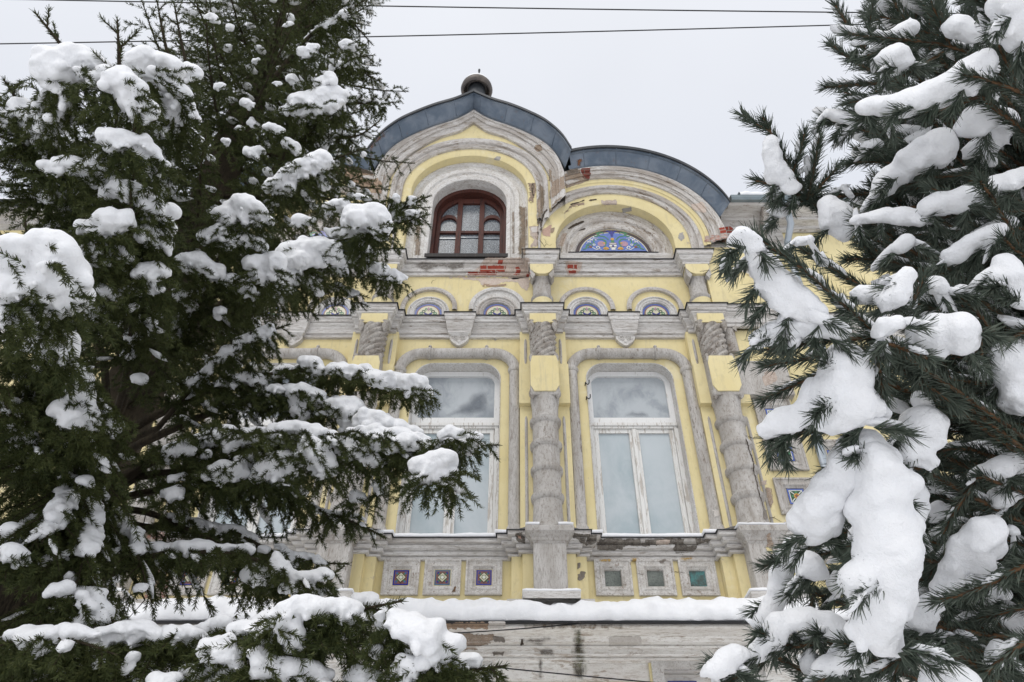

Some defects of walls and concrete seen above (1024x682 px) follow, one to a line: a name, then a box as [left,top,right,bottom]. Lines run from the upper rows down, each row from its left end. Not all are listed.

flaking render [330,110,733,291]
damp [520,624,622,677]